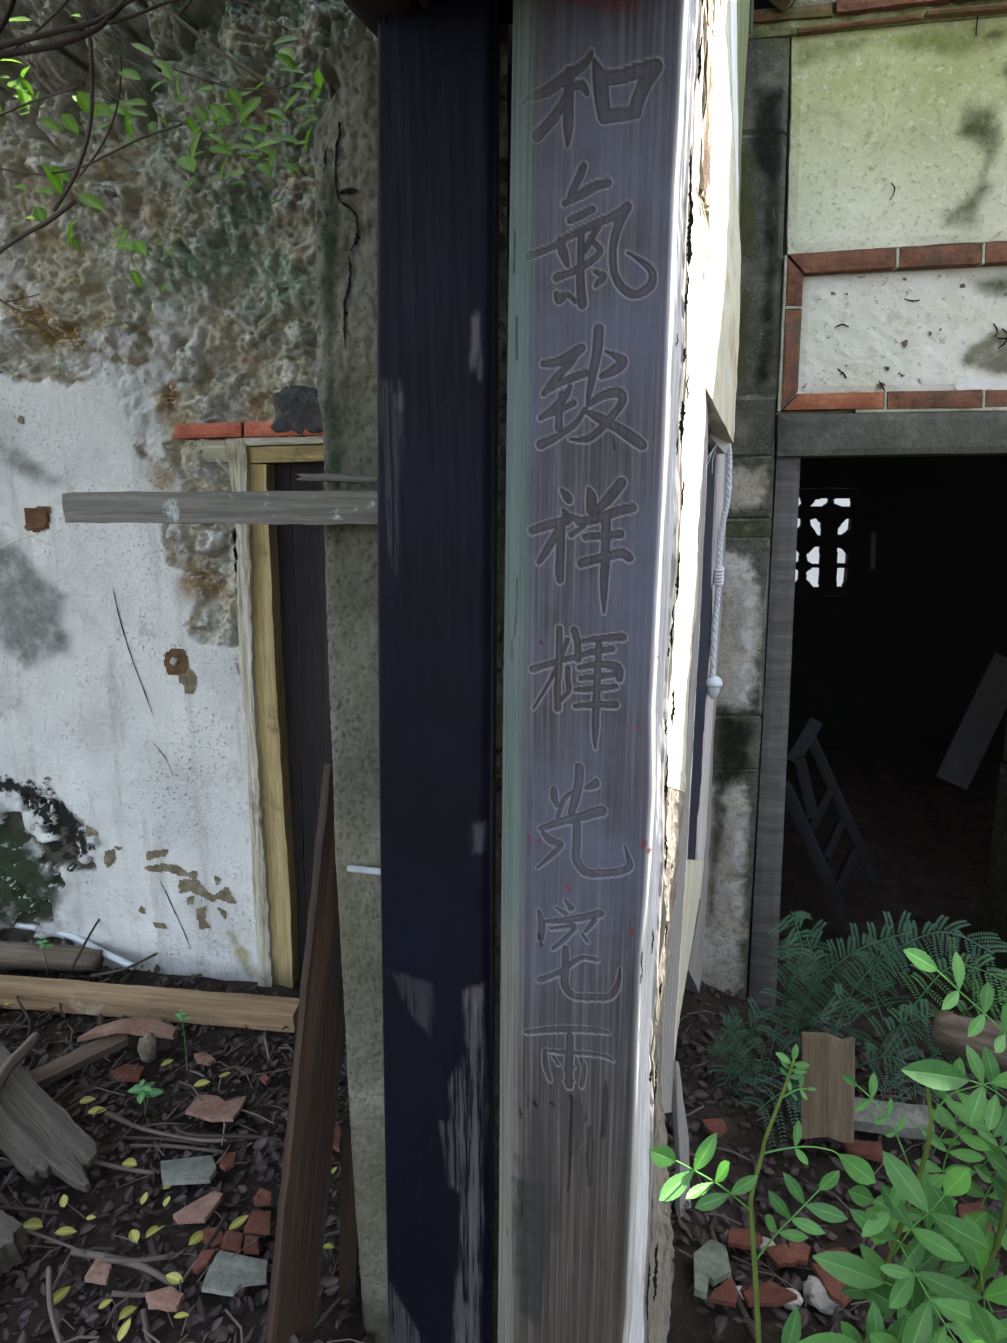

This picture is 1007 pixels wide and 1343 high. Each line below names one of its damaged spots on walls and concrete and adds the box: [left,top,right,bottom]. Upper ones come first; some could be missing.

damp [962,111,997,144]
damp [964,331,1007,372]
corrosion [164,648,188,675]
damp [734,587,758,704]
damp [710,711,750,918]
flaking render [104,846,122,868]
flaking render [145,849,236,930]
flaking render [138,906,167,929]